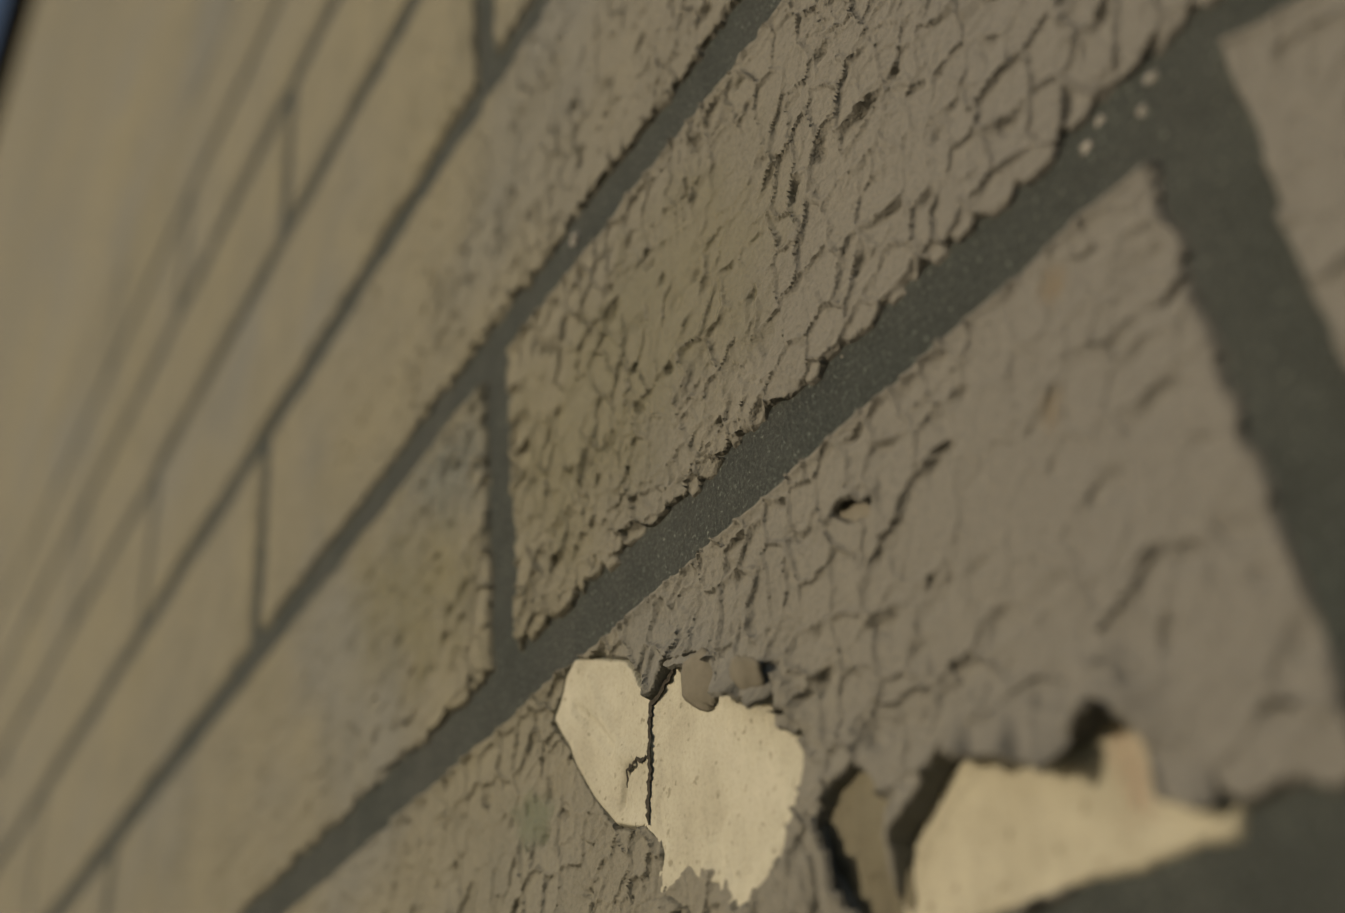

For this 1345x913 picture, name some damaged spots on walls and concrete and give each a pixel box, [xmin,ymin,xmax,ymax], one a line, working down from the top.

crack [626,668,676,825]
peeling [555,641,804,907]
peeling [803,696,1246,913]